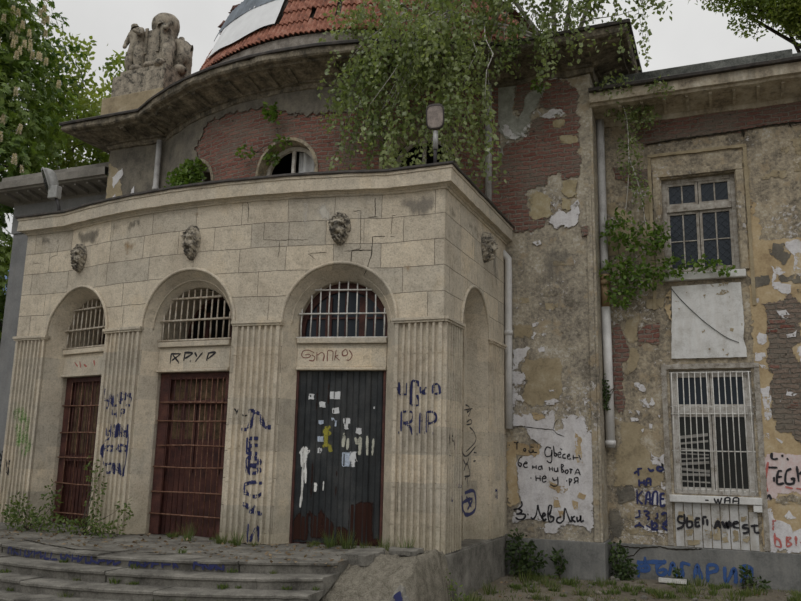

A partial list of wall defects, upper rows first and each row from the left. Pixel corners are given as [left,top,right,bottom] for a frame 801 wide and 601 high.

peeling [159,84,360,188]
crack [351,203,395,274]
spalling [498,78,590,246]
spalling [635,102,801,146]
peeling [506,317,594,534]
peeling [609,323,668,541]
peeling [730,199,801,553]